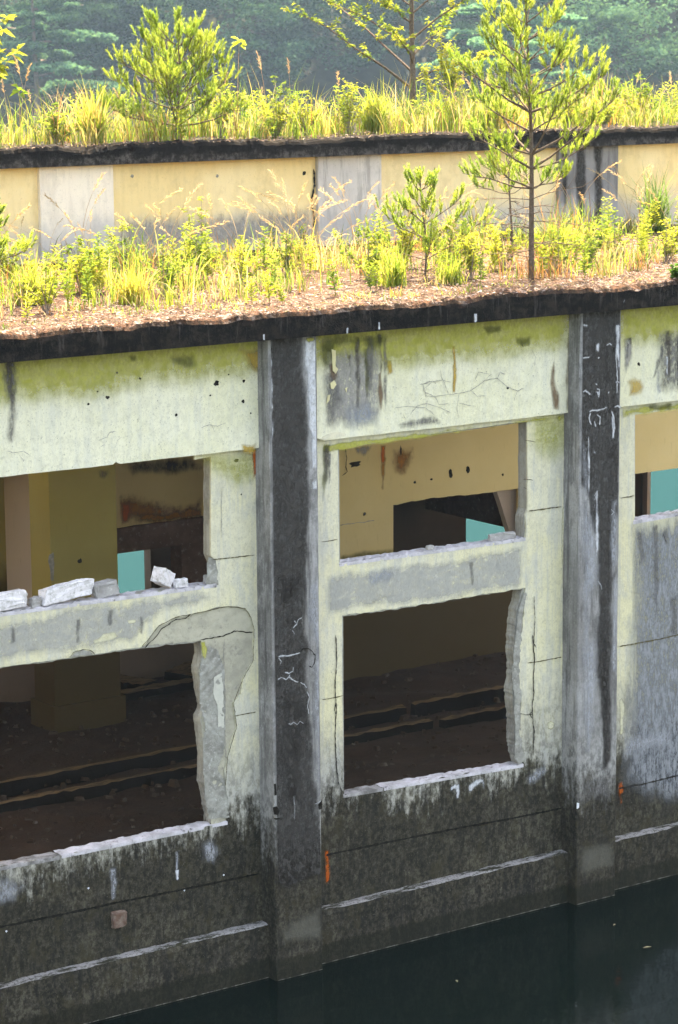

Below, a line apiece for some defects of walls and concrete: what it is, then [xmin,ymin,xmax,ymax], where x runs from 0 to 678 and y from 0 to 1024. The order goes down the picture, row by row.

water stain [5,362,15,439]
rust [381,446,411,488]
crack [396,371,523,420]
rust [551,365,559,409]
water stain [654,331,678,386]
spalling [143,606,254,824]
crack [278,617,344,785]
water stain [247,322,520,886]
spalling [512,593,527,764]
crack [524,600,561,750]
water stain [577,310,642,809]
water stain [84,874,676,1024]